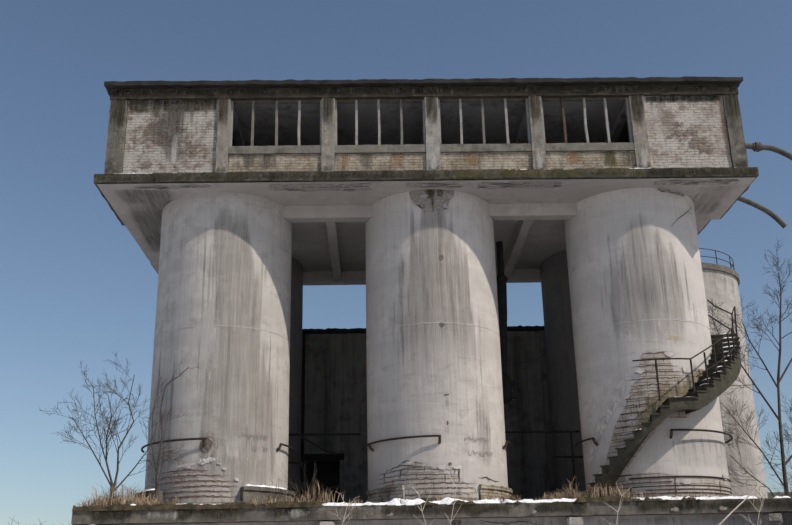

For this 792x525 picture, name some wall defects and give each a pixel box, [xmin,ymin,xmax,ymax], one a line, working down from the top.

spalling [406,182,459,212]
spalling [605,350,732,511]
spalling [149,433,239,505]
spalling [376,460,477,505]